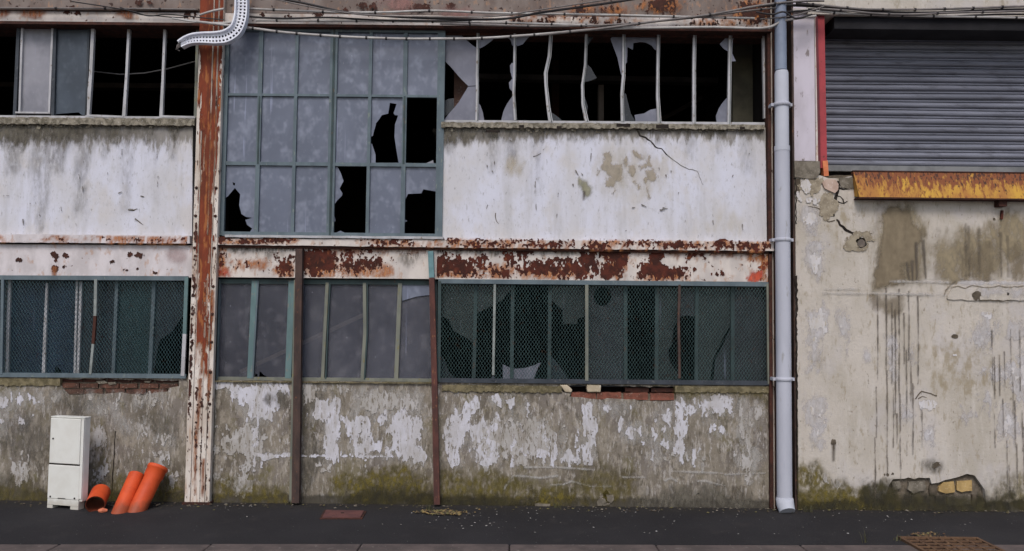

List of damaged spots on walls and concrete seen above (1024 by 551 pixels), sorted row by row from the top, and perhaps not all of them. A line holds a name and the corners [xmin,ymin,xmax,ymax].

corrosion [22,10,44,19]
crack [636,129,702,182]
corrosion [46,236,69,276]
corrosion [99,0,771,495]
flaking render [794,175,854,281]
spalling [843,230,875,252]
leakage [837,207,1024,495]
peeling [0,274,427,498]
peeling [442,386,763,485]
leakage [639,463,766,508]
flaking render [882,462,991,512]